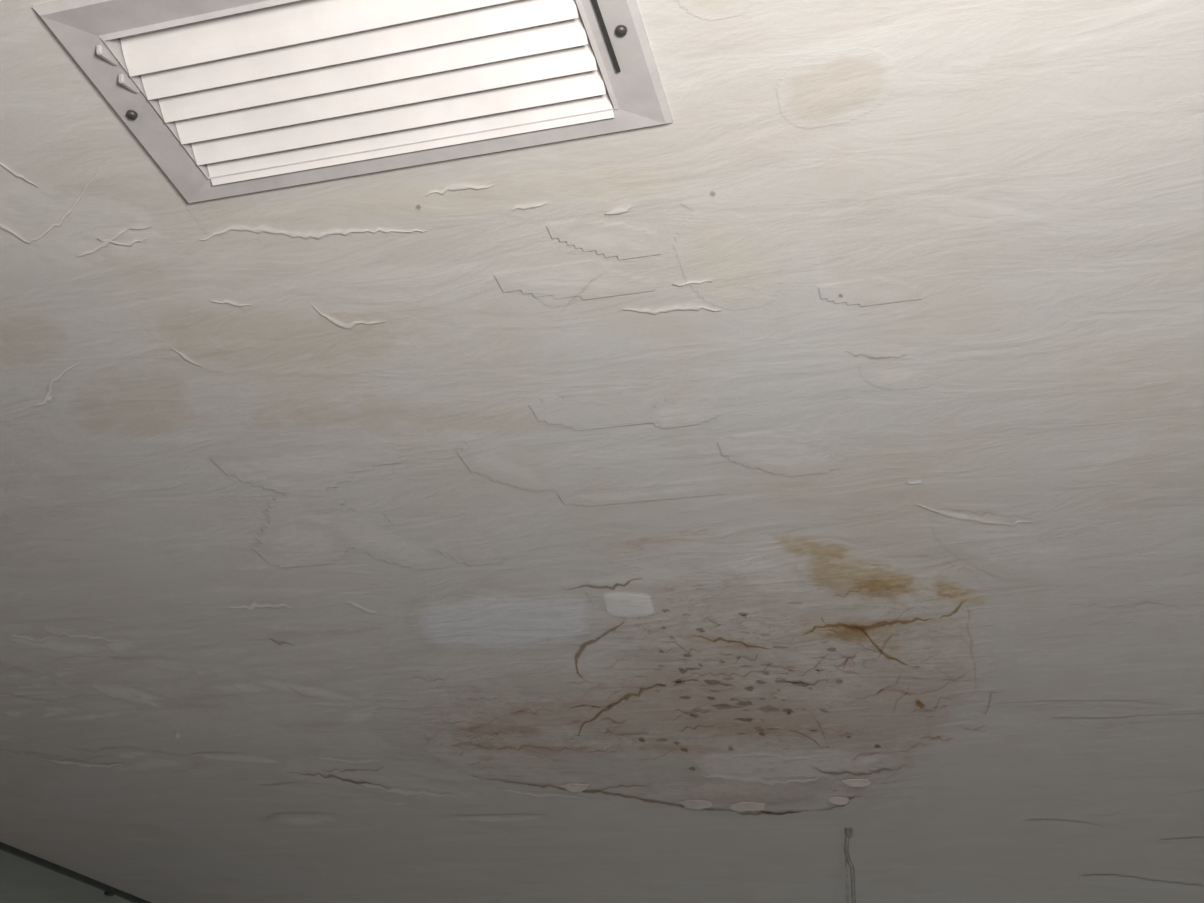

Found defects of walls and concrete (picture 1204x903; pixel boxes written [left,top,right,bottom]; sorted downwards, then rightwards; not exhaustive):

peeling [366,523,997,822]